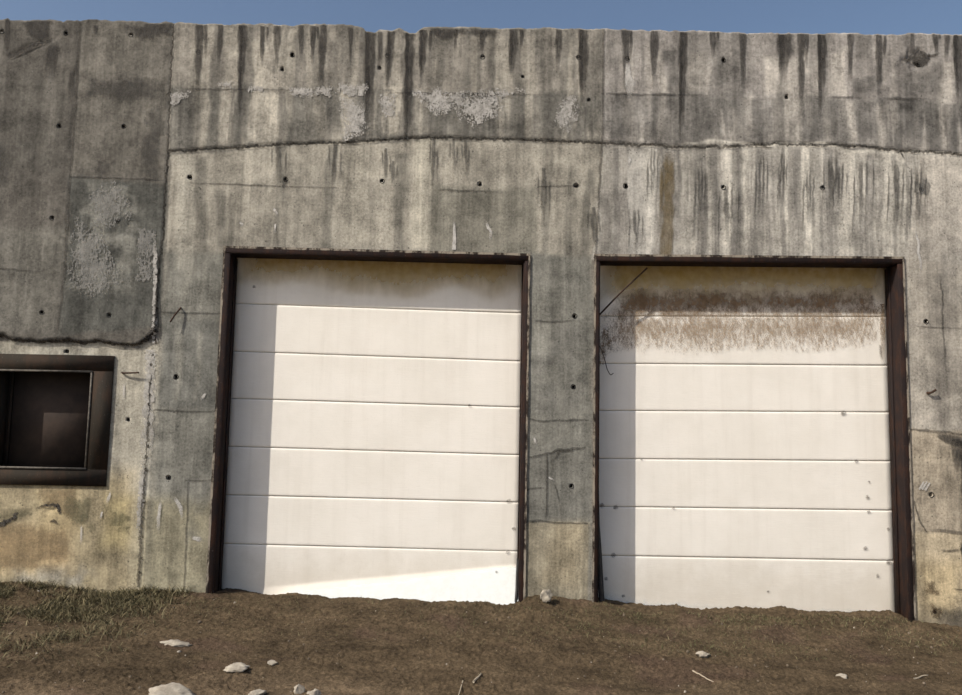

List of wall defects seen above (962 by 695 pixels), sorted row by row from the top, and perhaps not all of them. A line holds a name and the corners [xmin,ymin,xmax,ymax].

leakage [195,24,223,73]
leakage [218,25,264,94]
leakage [260,25,281,55]
leakage [288,24,526,165]
leakage [578,29,588,81]
leakage [621,30,634,89]
leakage [650,31,658,67]
leakage [679,32,687,112]
leakage [777,34,827,90]
leakage [876,34,886,78]
leakage [933,34,962,86]
crack [137,24,962,587]